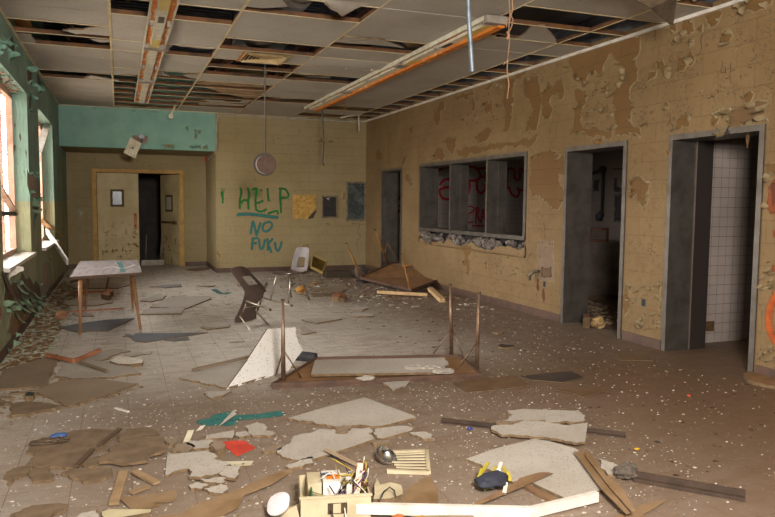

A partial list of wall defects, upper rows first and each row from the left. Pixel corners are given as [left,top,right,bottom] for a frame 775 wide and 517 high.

spalling [488,24,557,43]
peeling [667,9,734,47]
peeling [733,0,774,16]
peeling [433,36,695,211]
peeling [710,90,770,137]
peeling [27,170,45,214]
spalling [420,231,526,276]
peeling [0,266,78,375]